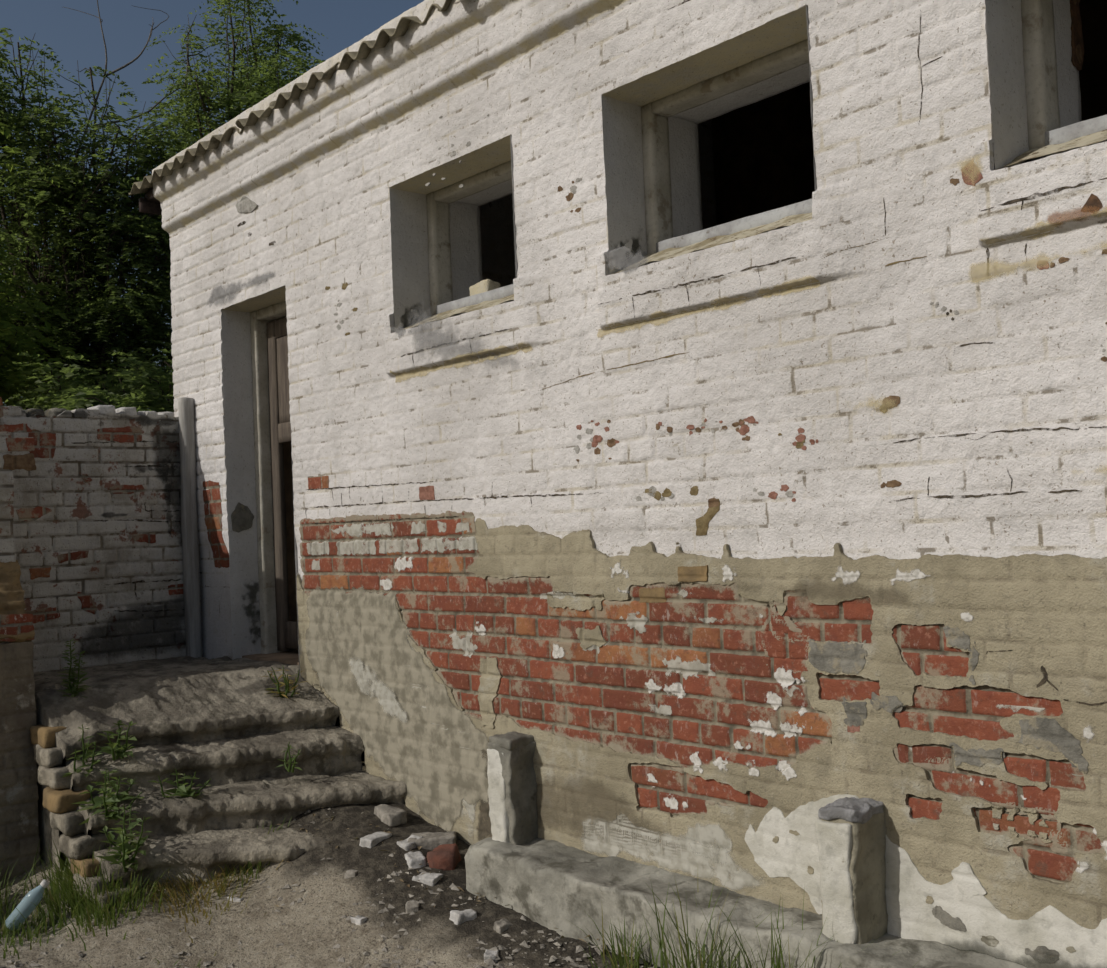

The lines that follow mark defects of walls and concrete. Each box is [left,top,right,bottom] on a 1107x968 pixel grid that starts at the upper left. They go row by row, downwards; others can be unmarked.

crack [917,10,943,122]
crack [981,178,1107,211]
crack [984,248,992,276]
peeling [573,420,619,462]
peeling [686,416,758,441]
peeling [792,428,819,450]
crack [894,426,1107,443]
damp [136,431,182,543]
crack [898,471,1080,501]
flaking render [203,480,254,568]
spalling [690,486,720,536]
peeling [297,511,1107,968]